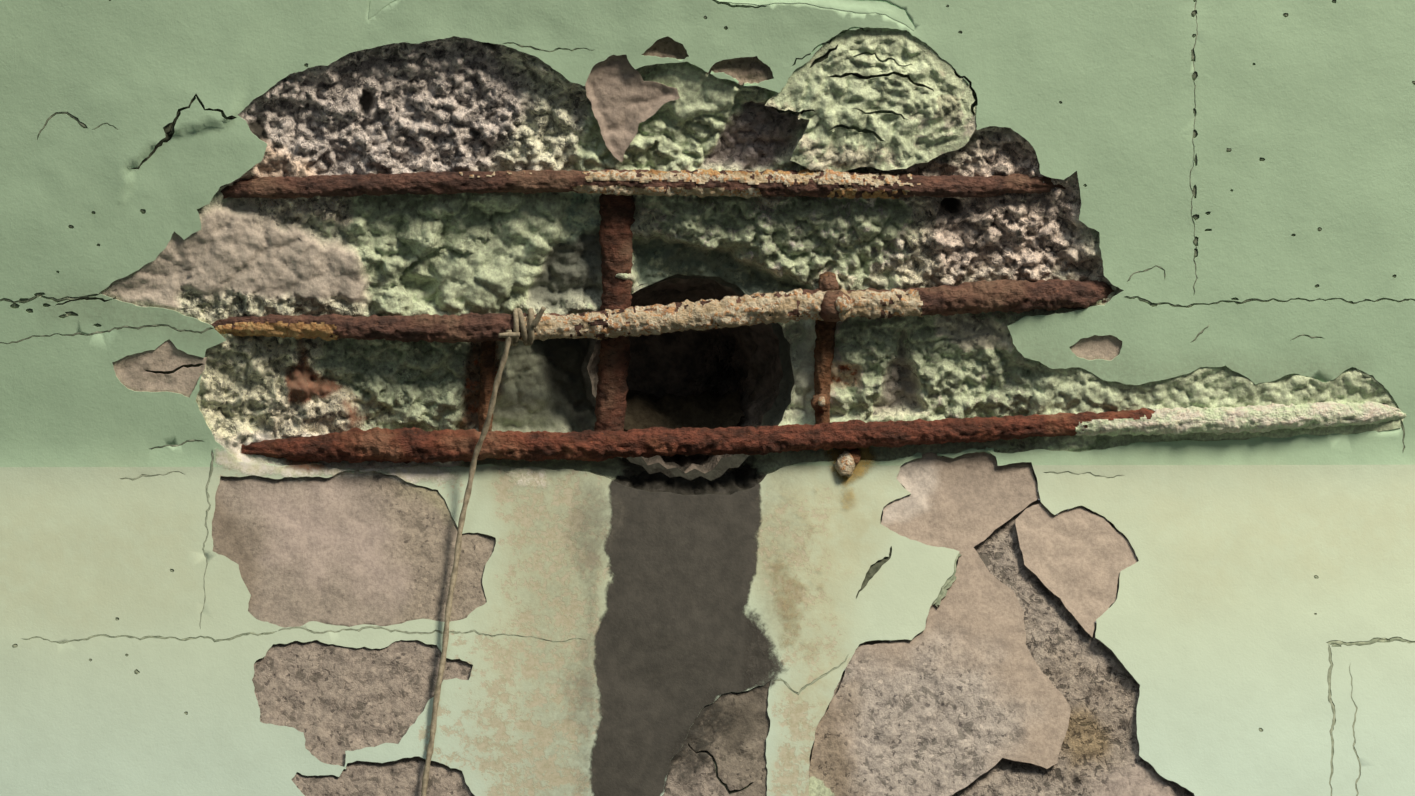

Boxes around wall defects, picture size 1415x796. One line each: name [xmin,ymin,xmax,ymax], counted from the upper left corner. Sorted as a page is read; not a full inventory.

crack [131,94,236,169]
crack [1125,0,1415,343]
crack [0,292,214,344]
rust [286,340,362,424]
spalling [100,36,1123,469]
efflorescence [216,450,457,484]
rust [826,447,875,481]
peeling [212,472,496,628]
damp [590,464,783,796]
flaking render [476,308,1407,796]
peeling [252,640,474,796]
crack [1326,637,1415,796]